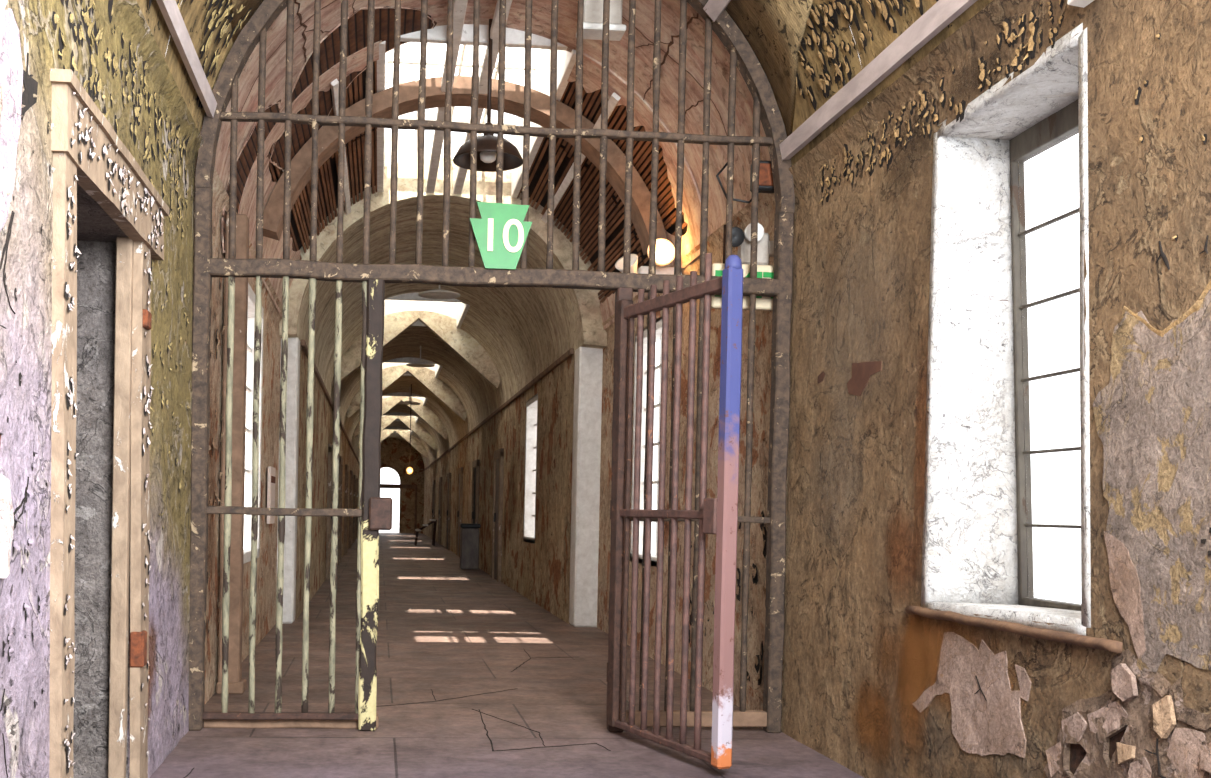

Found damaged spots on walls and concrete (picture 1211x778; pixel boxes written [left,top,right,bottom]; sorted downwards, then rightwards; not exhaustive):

peeling [175,0,252,83]
peeling [796,0,939,112]
peeling [978,0,1064,92]
flaking render [0,0,40,231]
peeling [819,67,966,206]
flaking render [0,474,34,578]
peeling [66,442,79,513]
peeling [1044,276,1211,778]
peeling [2,596,44,662]
peeling [912,632,1032,758]
peeling [64,725,75,773]
crack [1144,738,1166,778]